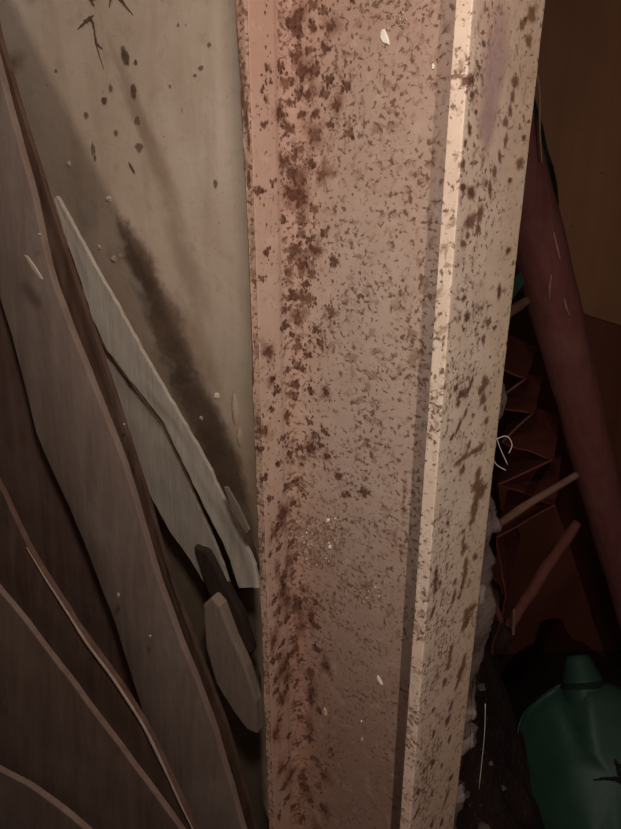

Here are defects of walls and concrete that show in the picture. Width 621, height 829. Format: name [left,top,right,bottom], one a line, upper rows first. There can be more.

crack [77,0,133,69]
rust [520,6,536,47]
rust [461,65,481,98]
rust [241,85,250,146]
rust [488,76,519,195]
rust [461,206,483,246]
rust [244,0,355,829]
rust [450,376,488,440]
rust [455,440,485,474]
rust [451,467,488,604]
rust [461,603,476,631]
rust [446,655,466,726]